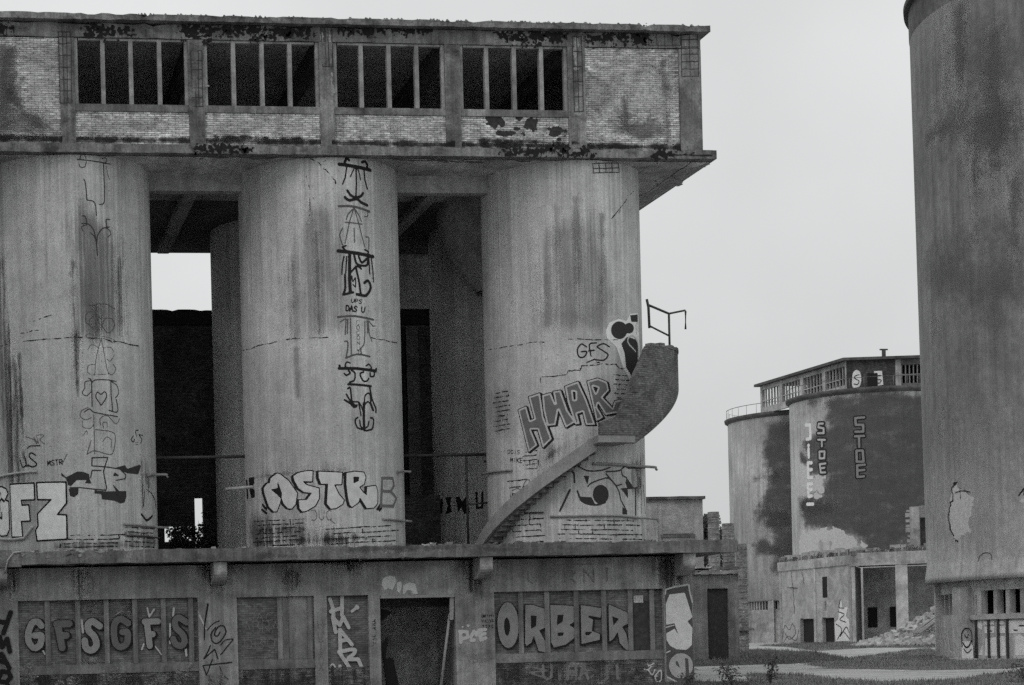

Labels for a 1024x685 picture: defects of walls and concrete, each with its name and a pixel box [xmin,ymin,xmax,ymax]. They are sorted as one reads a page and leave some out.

leakage [0,47,62,142]
leakage [206,106,681,150]
leakage [0,339,23,483]
leakage [757,392,925,573]
peeling [950,485,974,541]